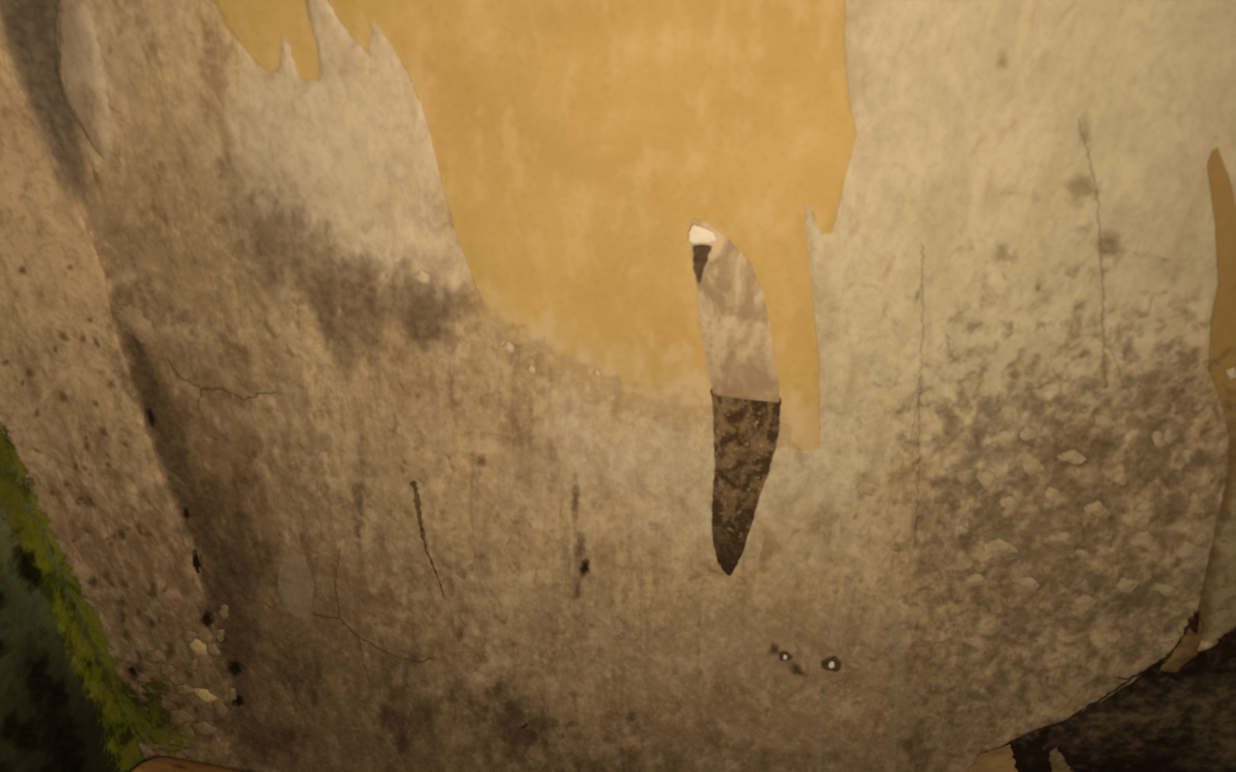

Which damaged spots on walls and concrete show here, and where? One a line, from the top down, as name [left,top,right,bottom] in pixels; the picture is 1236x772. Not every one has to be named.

mould [14,547,41,588]
peeling [0,48,237,769]
leakage [255,222,455,341]
crack [411,481,445,599]
peeling [215,0,857,576]
peeling [968,148,1236,772]